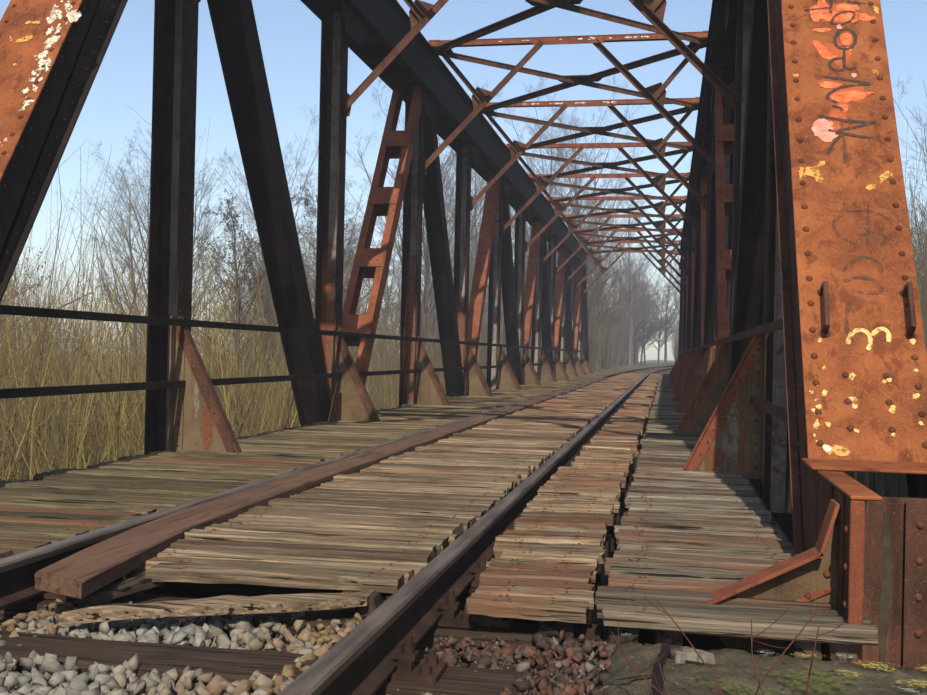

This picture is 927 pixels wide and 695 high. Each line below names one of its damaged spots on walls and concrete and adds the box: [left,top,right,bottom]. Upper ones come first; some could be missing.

peeling [22,0,82,111]
peeling [809,385,851,456]
rust [878,514,892,667]
crack [614,637,718,695]